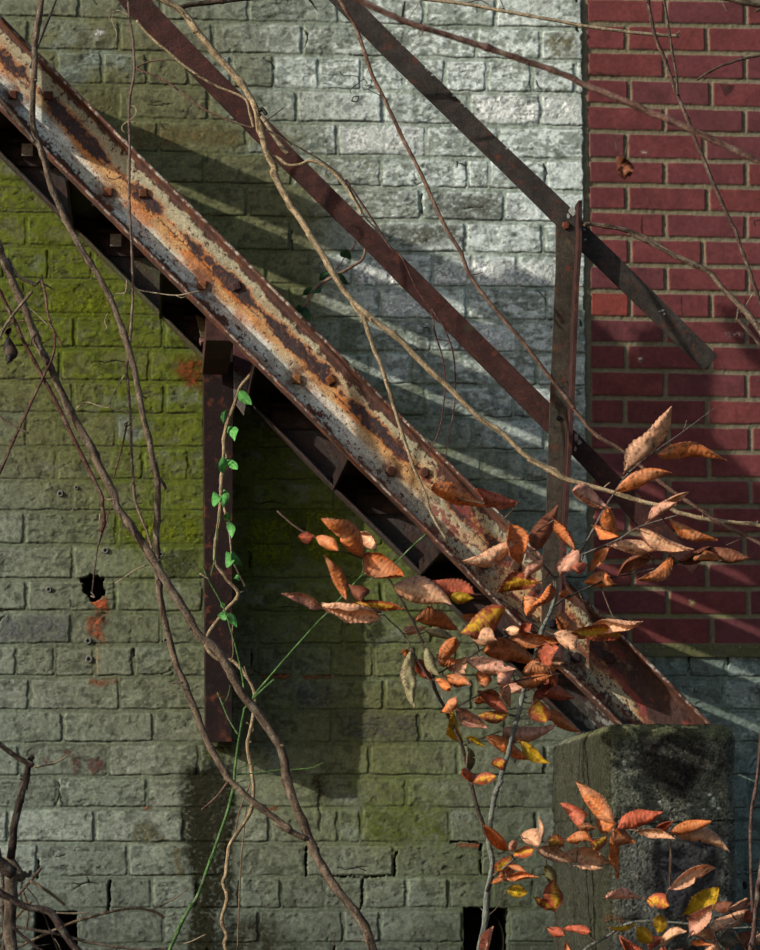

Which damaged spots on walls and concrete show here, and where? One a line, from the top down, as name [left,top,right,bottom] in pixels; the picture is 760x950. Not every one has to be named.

spalling [84,577,107,608]
damp [641,734,728,798]
damp [174,744,237,950]
damp [234,922,274,950]